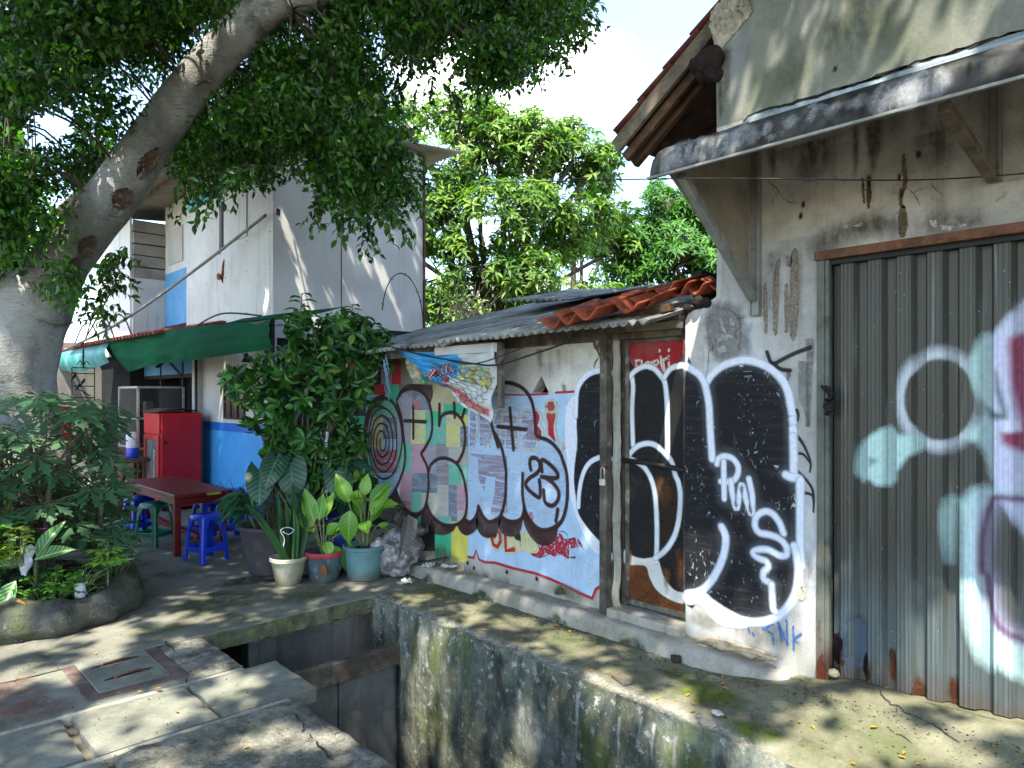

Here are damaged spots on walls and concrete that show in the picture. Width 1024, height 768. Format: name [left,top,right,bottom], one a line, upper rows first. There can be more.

spalling [709,0,752,49]
flaking render [861,176,872,208]
flaking render [895,151,921,238]
damp [815,218,890,252]
flaking render [762,248,800,341]
rust [816,654,825,680]
rust [951,678,959,706]